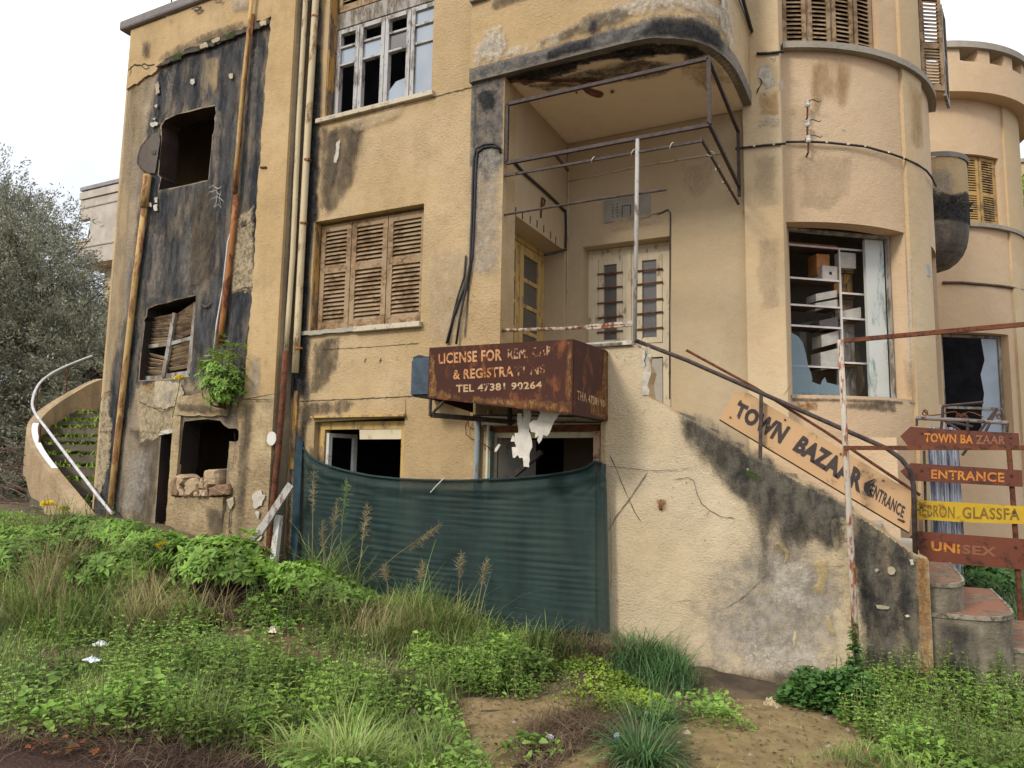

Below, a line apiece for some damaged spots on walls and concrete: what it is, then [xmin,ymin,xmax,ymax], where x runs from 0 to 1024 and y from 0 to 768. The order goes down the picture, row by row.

spalling [156,19,270,67]
water stain [470,8,725,272]
water stain [290,0,363,443]
water stain [932,173,971,226]
peeling [153,381,184,409]
crack [609,466,734,519]
water stain [683,416,920,685]